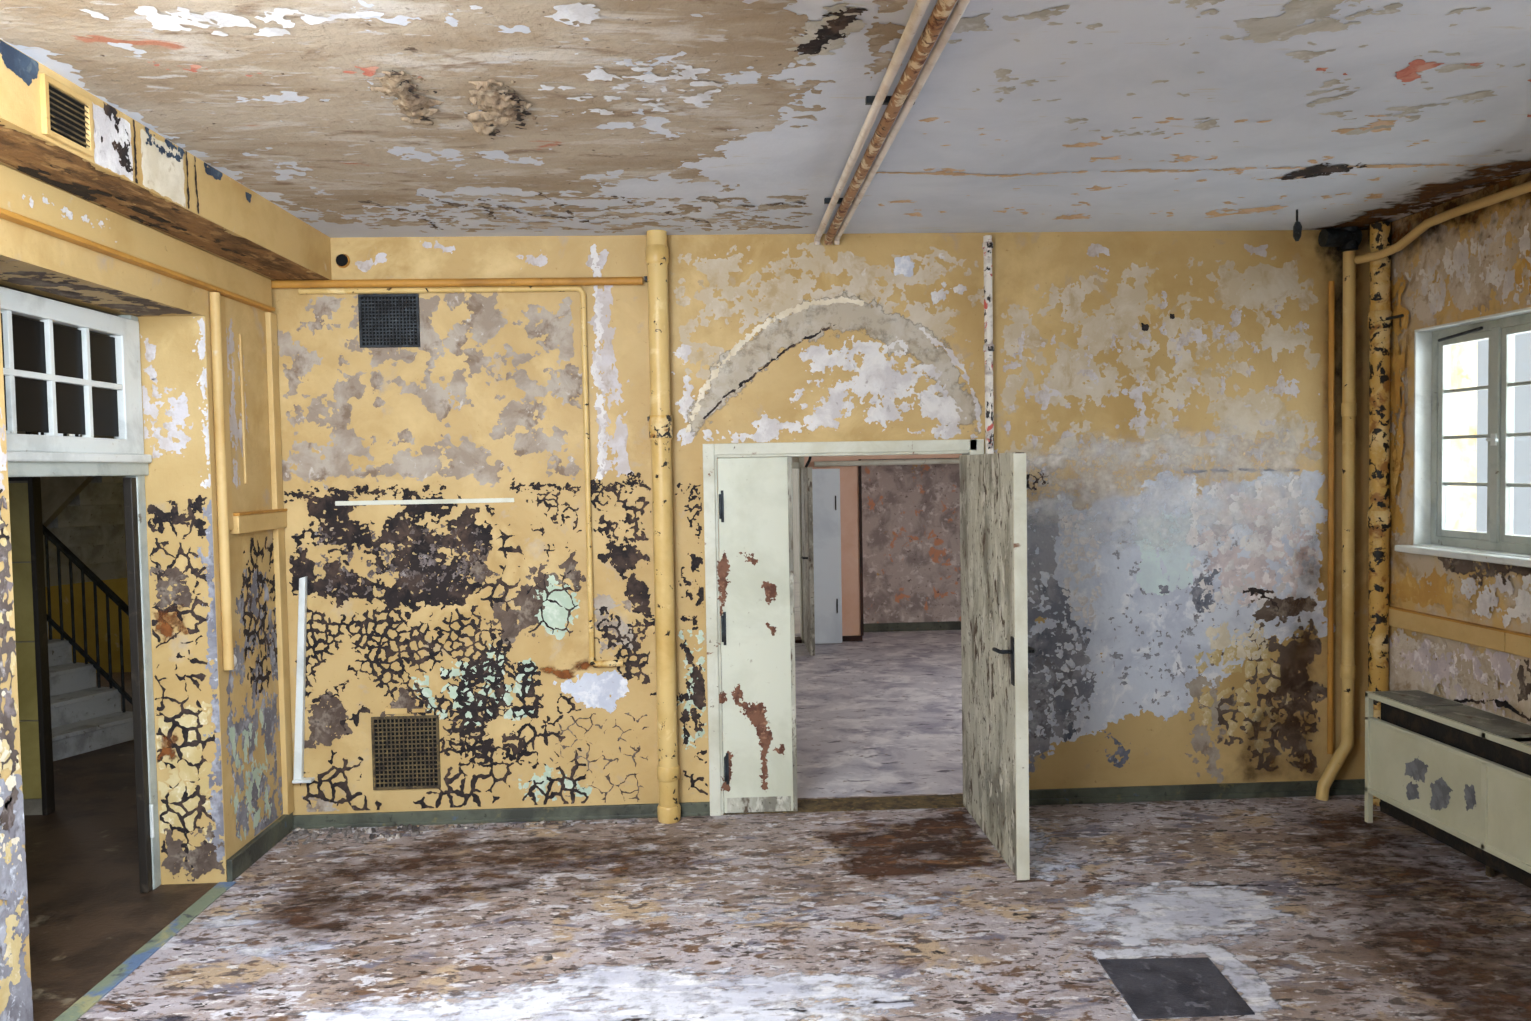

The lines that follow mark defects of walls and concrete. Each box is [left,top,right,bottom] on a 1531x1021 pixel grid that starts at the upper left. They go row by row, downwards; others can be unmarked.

peeling [1165,0,1531,135]
peeling [0,0,984,503]
water stain [1315,150,1531,325]
water stain [1334,347,1342,388]
peeling [0,691,33,1021]
peeling [304,691,353,749]
peeling [295,524,655,726]
crack [149,192,806,870]
peeling [518,764,593,802]
peeling [677,550,785,792]
peeling [994,243,1335,783]
peeling [1389,628,1531,725]